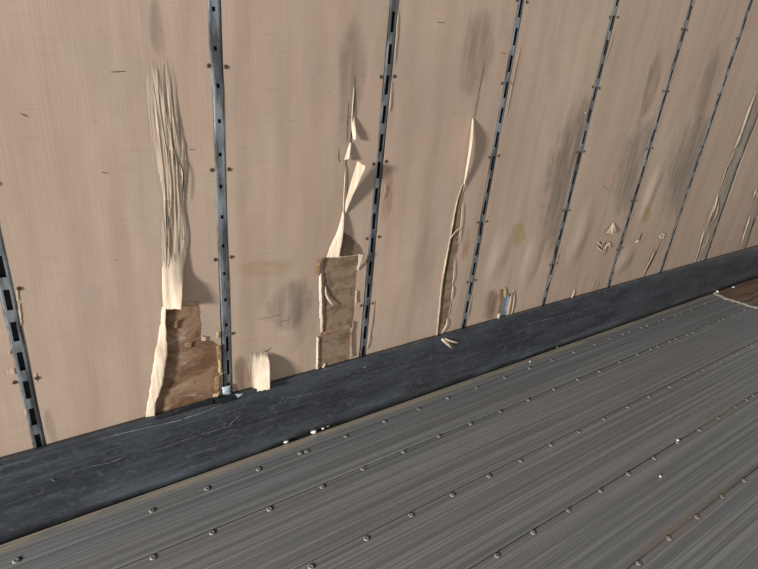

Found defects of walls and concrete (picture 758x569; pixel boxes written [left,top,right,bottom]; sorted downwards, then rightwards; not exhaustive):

peeling [344,117,356,160]
spalling [316,232,365,369]
spalling [155,302,222,414]